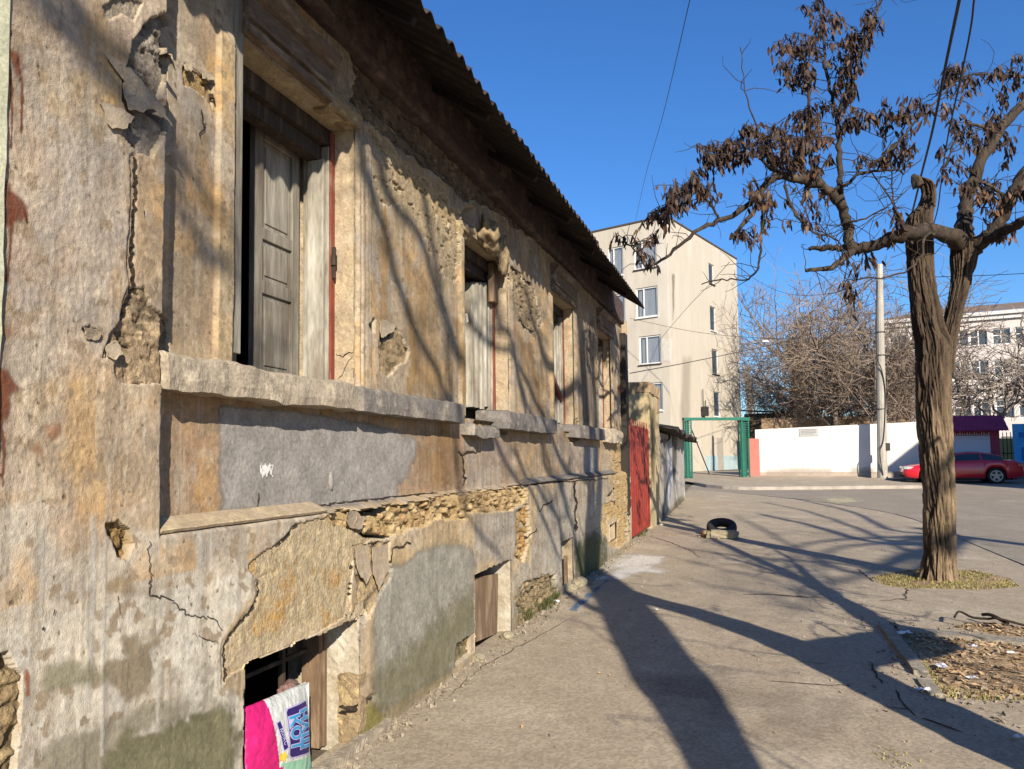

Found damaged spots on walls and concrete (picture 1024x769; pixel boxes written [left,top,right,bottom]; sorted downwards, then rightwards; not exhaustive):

corrosion [10,51,24,147]
spalling [100,0,215,157]
corrosion [4,181,27,282]
crack [104,157,145,358]
spalling [365,128,464,283]
spalling [82,288,166,385]
spalling [105,522,125,558]
crack [147,541,259,682]
spalling [223,487,528,676]
crack [507,478,614,540]
spalling [601,444,629,548]
spalling [0,654,21,769]